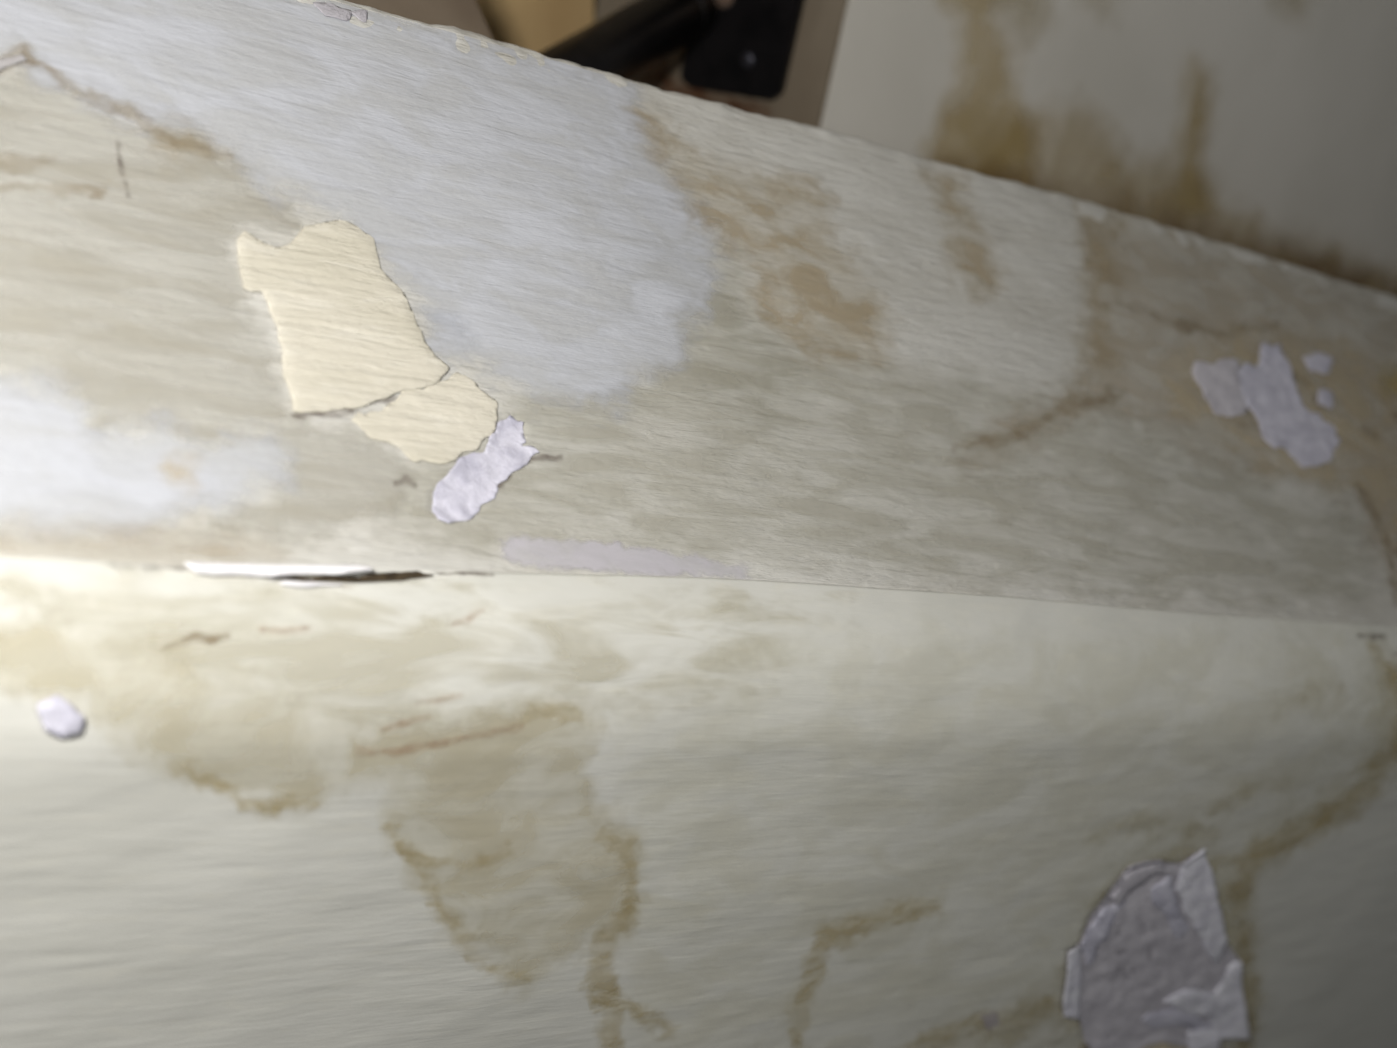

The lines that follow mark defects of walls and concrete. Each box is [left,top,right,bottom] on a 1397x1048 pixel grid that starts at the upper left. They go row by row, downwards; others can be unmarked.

leakage [940,54,1029,185]
peeling [0,0,716,527]
leakage [769,235,874,330]
spalling [1192,343,1341,468]
crack [184,562,477,587]
spalling [37,695,85,738]
spalling [1063,849,1250,1048]